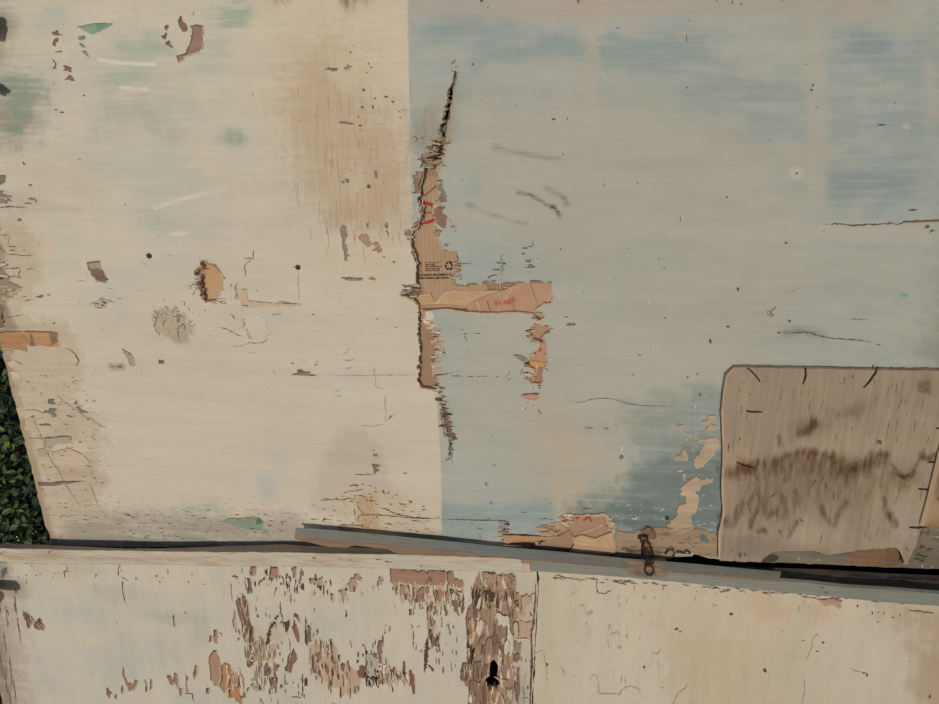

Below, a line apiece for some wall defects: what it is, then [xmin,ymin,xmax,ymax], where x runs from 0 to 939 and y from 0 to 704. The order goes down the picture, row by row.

peeling [161,16,204,63]
spalling [0,175,12,204]
crack [826,219,939,227]
peeling [3,350,22,387]
spalling [522,385,541,403]
peeling [667,415,721,534]
peeling [206,566,362,704]
peeling [377,569,519,704]
peeling [106,667,152,700]
peeling [167,665,198,697]